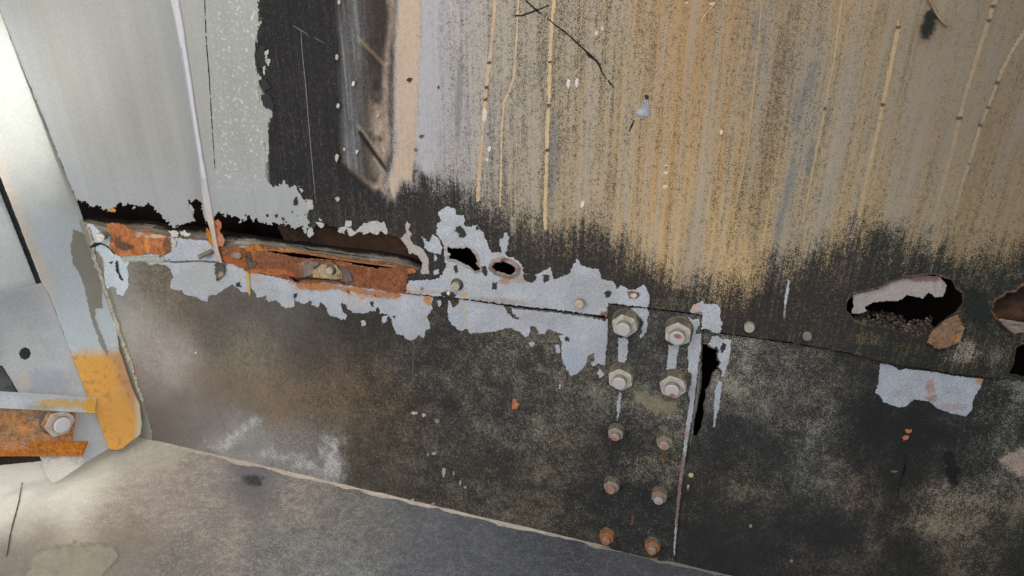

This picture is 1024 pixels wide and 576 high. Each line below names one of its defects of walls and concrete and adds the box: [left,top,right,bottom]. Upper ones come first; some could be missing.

leakage [476,0,497,202]
leakage [499,0,520,207]
leakage [542,0,556,230]
leakage [857,21,901,217]
leakage [920,8,940,39]
leakage [930,0,998,225]
leakage [952,30,1024,216]
rust [107,208,172,263]
rust [206,219,416,299]
peeling [0,0,792,555]
spalling [846,274,963,334]
peeling [867,318,1024,416]